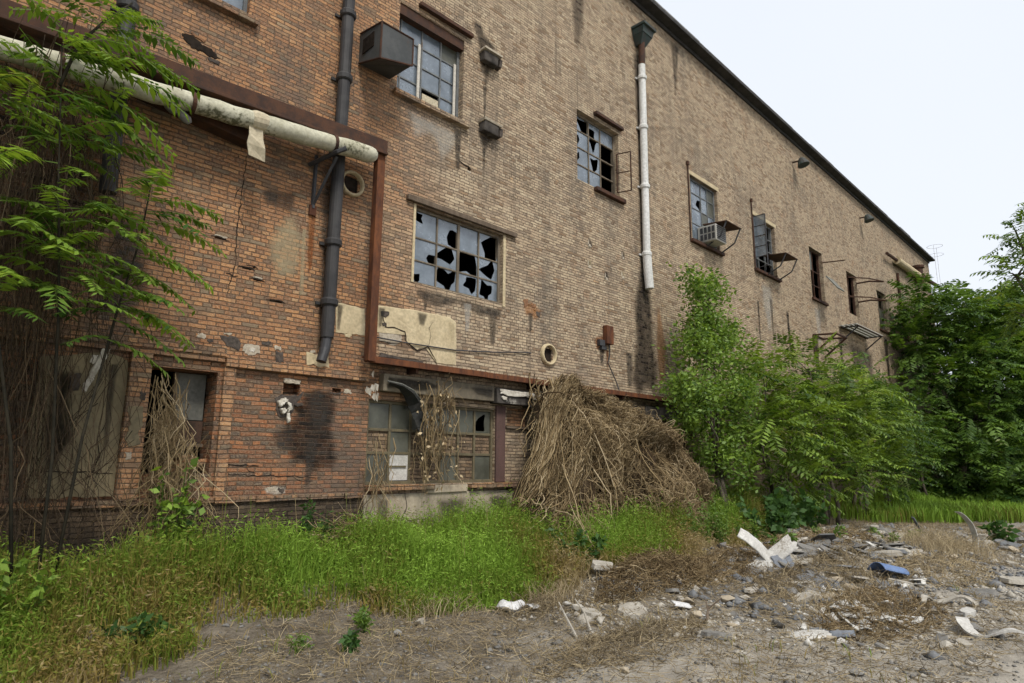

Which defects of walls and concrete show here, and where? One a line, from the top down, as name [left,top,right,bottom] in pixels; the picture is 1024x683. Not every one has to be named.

spalling [182,31,220,66]
crack [227,156,247,293]
water stain [626,55,656,393]
spalling [197,333,284,363]
peeling [377,305,457,366]
water stain [277,390,335,484]